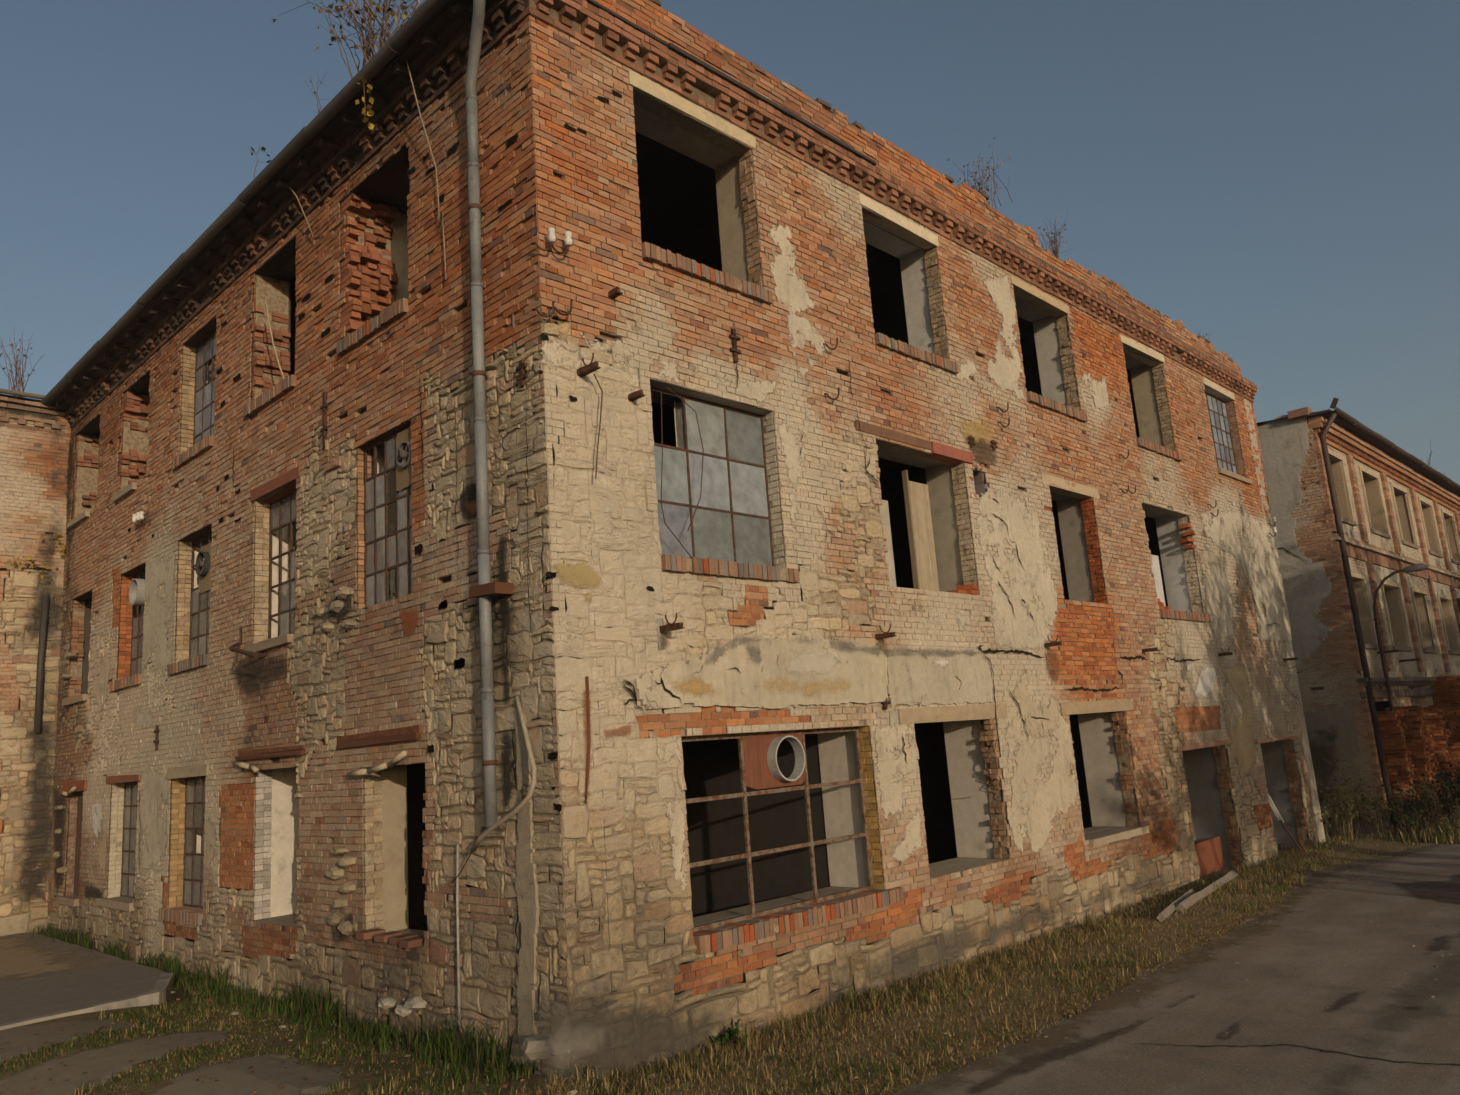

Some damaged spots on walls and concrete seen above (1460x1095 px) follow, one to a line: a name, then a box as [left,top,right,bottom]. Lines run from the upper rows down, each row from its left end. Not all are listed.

peeling [786,311,831,376]
hole [970,463,991,500]
leakage [26,444,72,639]
peeling [1205,563,1234,640]
leakage [235,657,286,694]
spalling [636,705,810,739]
leakage [18,729,64,900]